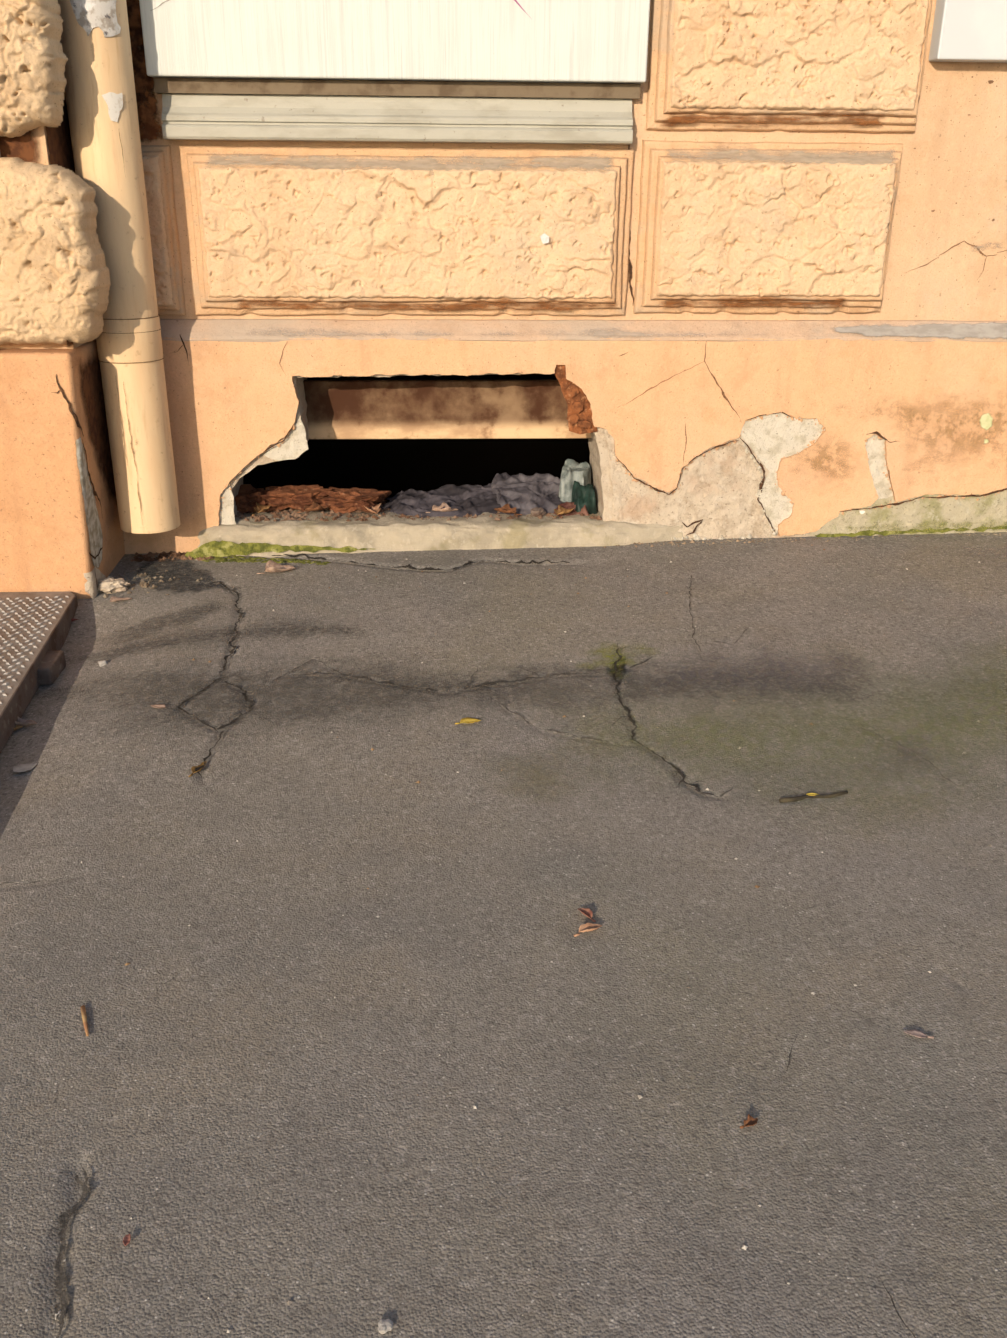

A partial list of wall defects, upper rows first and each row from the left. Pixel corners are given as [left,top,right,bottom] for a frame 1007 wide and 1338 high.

crack [913,241,1007,277]
crack [51,374,84,437]
flaking render [75,437,106,599]
flaking render [219,417,308,525]
crack [272,553,570,570]
flaking render [554,365,598,434]
crack [624,341,739,416]
flaking render [612,412,825,541]
flaking render [808,431,1007,537]
peeling [980,413,993,443]
crack [177,581,734,799]
crack [49,1165,92,1338]